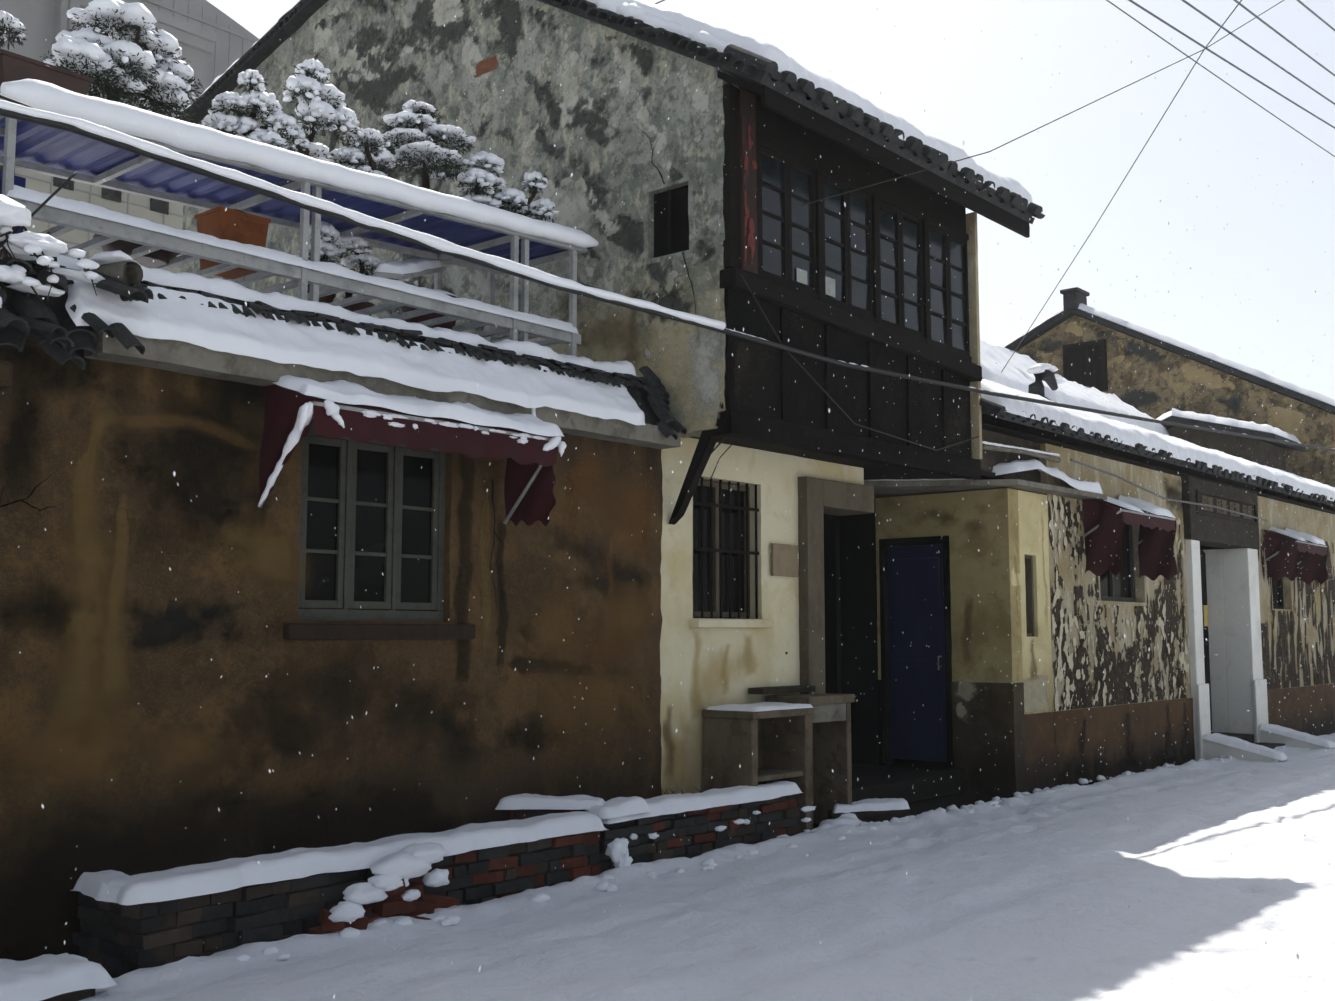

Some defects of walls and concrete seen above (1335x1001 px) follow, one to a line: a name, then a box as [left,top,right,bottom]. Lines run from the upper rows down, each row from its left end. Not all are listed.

mould [314,0,559,132]
mould [589,36,653,104]
mould [328,125,338,153]
mould [473,114,513,146]
mould [384,163,441,192]
mould [525,71,692,322]
mould [382,276,454,294]
mould [695,240,716,264]
crack [0,474,56,511]
water stain [479,480,508,663]
peeling [1048,495,1191,711]
peeling [1258,535,1335,690]